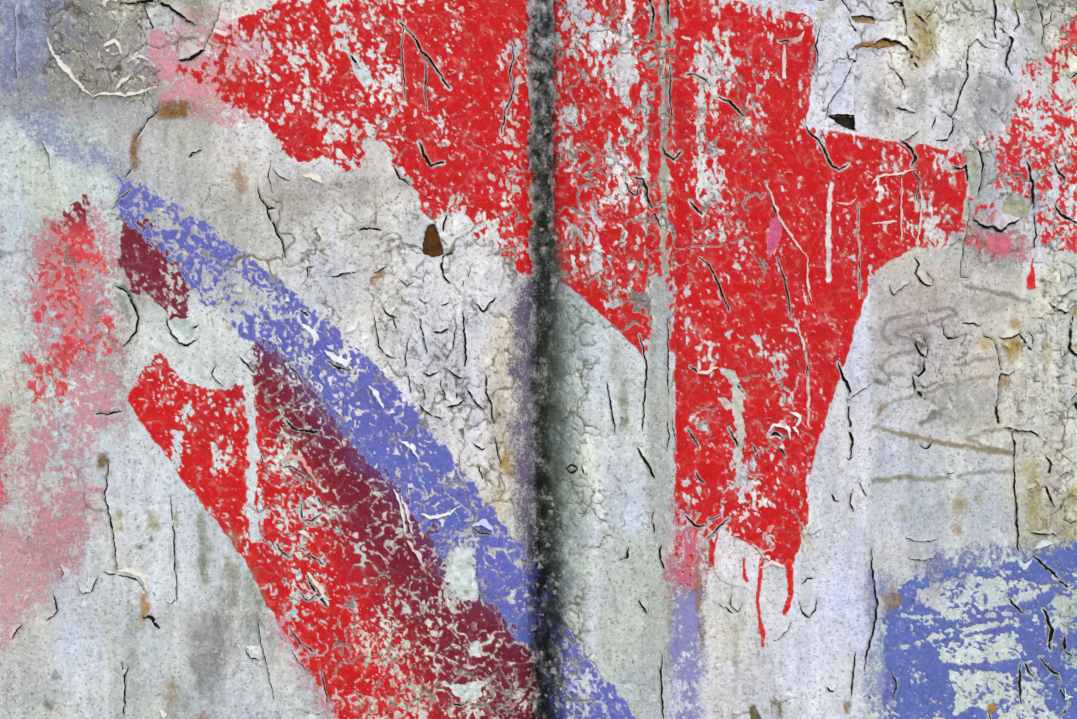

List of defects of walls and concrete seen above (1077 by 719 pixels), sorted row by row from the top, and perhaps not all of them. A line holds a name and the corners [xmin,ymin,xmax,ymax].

peeling [47,37,157,97]
crack [779,0,853,170]
peeling [828,99,863,130]
peeling [840,1,959,93]
crack [837,0,1052,292]
crack [1027,161,1077,248]
peeling [263,291,356,399]
peeling [369,215,519,493]
water stain [529,0,574,719]
crack [46,462,177,630]
peeling [261,416,325,564]
crack [1013,460,1072,588]